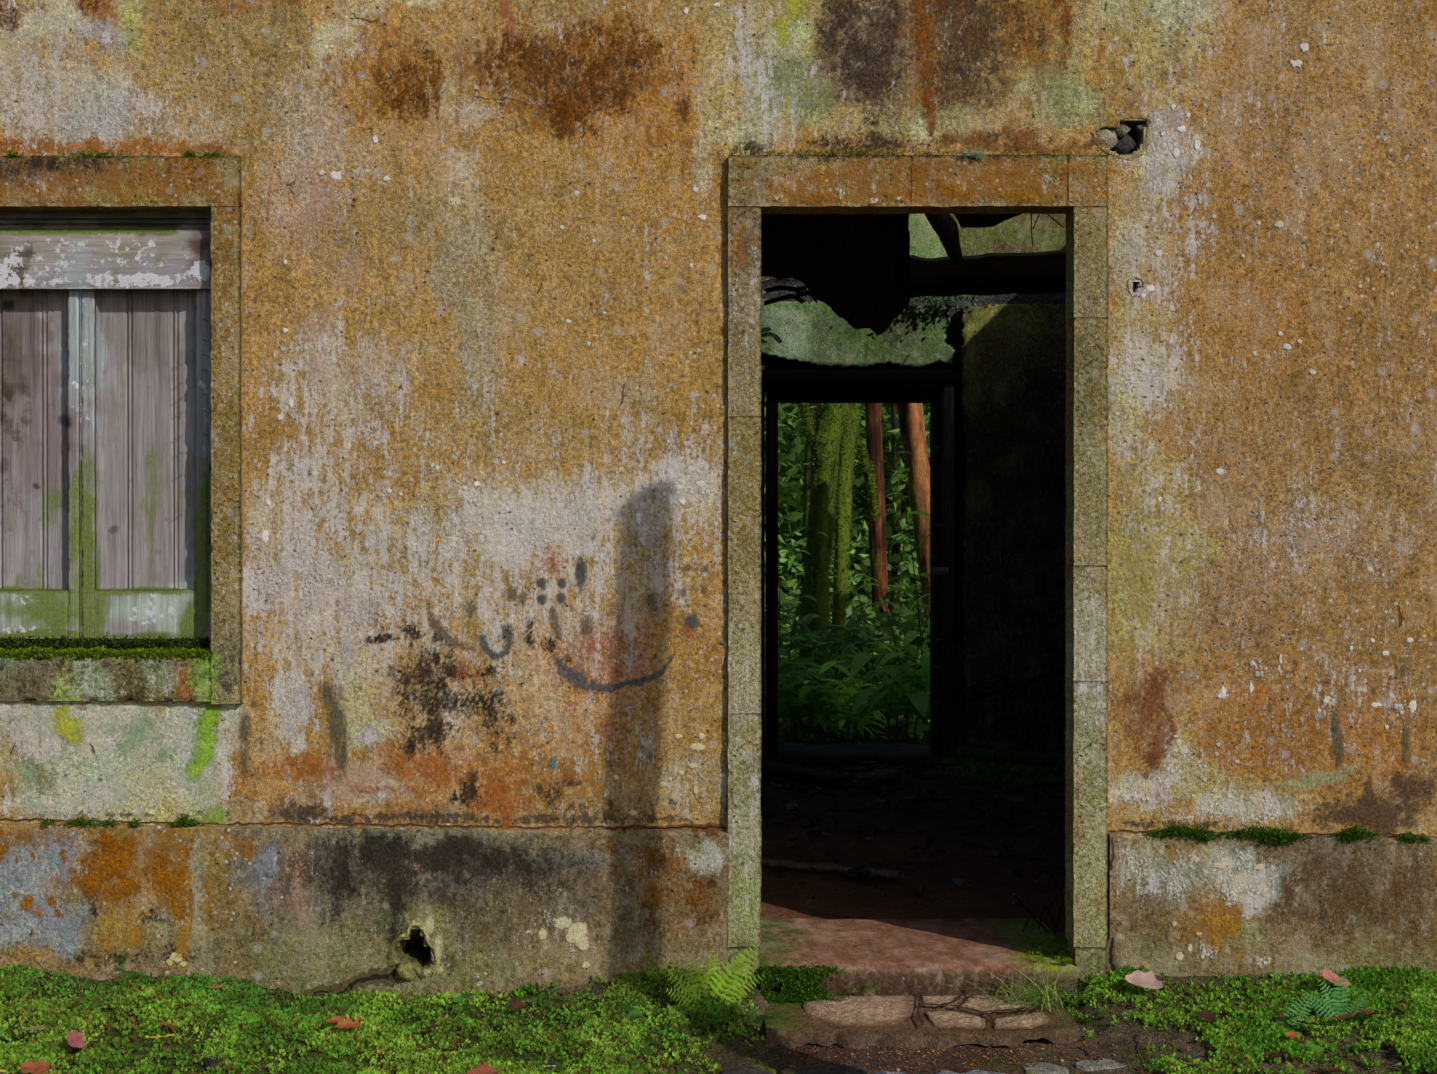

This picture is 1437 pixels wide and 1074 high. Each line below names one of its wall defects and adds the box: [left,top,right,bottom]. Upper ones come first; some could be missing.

corrosion [468,0,672,142]
corrosion [678,92,690,121]
damp [812,0,907,138]
damp [923,0,1064,112]
damp [243,522,519,799]
damp [502,617,572,663]
spalling [387,908,443,989]
damp [320,822,721,950]